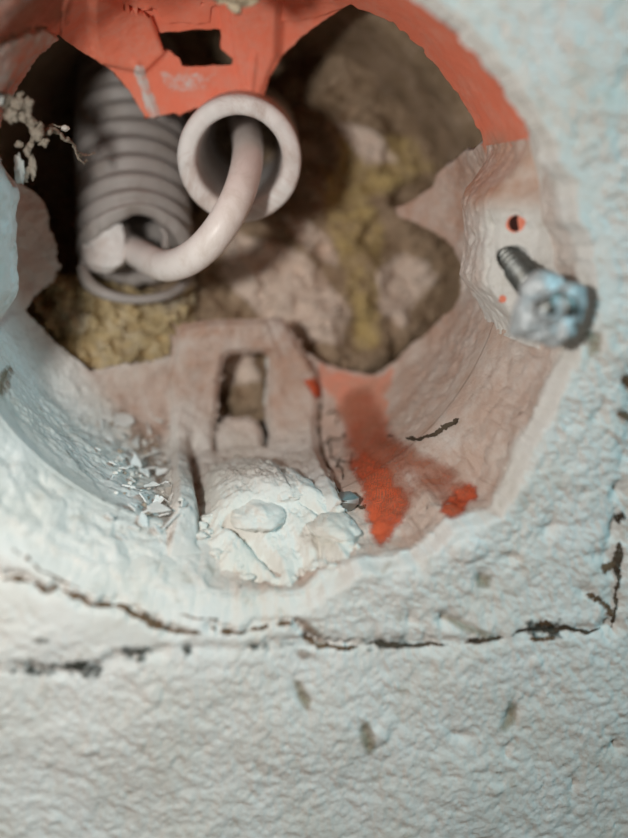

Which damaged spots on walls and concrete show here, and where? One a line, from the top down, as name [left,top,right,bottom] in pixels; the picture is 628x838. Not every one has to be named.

spalling [165,29,233,67]
spalling [267,4,483,173]
spalling [0,28,82,276]
spalling [214,116,233,163]
spalling [256,119,279,165]
spalling [189,196,206,216]
spalling [439,254,461,315]
crack [3,510,626,651]